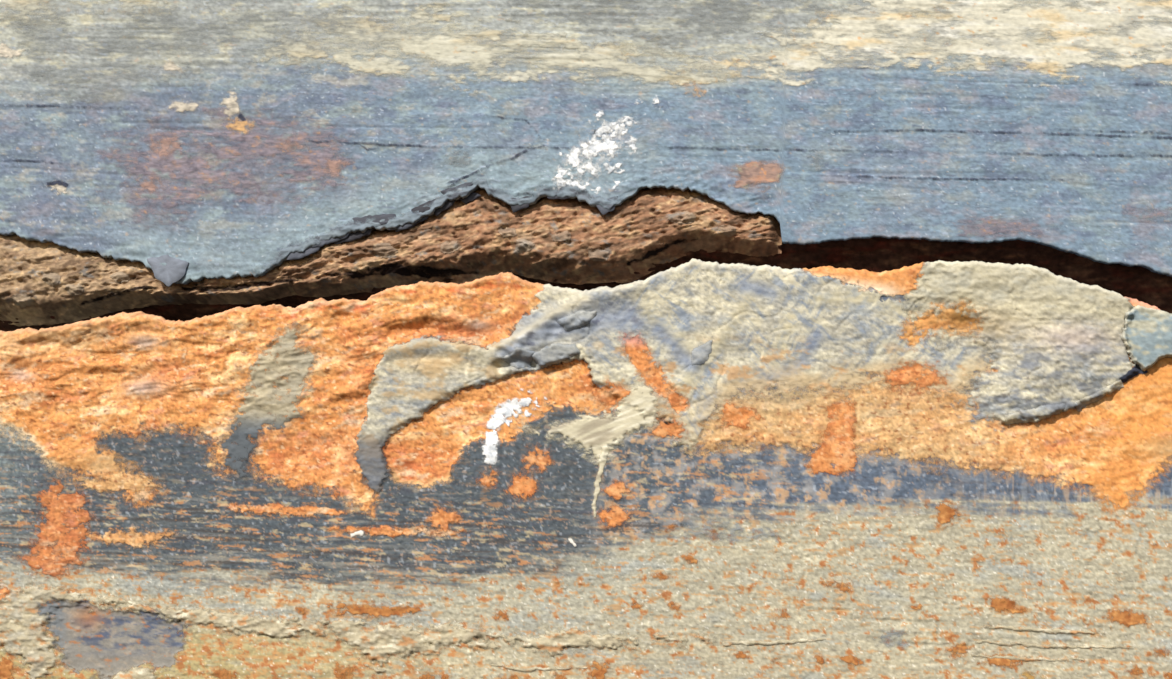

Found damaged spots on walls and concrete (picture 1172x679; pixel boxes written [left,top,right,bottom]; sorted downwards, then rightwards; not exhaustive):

crack [0,263,478,332]
peeling [0,178,997,518]
crack [510,237,1172,313]
rust [802,262,924,296]
rust [900,301,983,346]
rust [1125,296,1160,310]
rust [0,272,551,578]
rust [382,359,630,489]
rust [623,334,1172,513]
rust [598,480,632,527]
spalling [38,599,189,679]
rust [327,602,420,617]